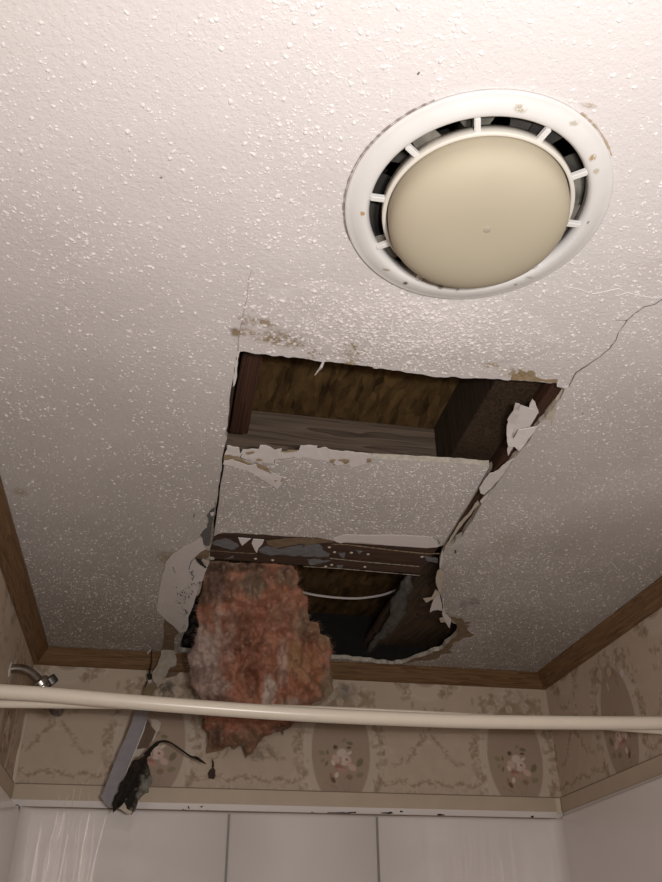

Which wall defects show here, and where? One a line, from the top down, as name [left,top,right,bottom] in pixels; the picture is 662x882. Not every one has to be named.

crack [569,299,662,386]
peeling [157,503,216,636]